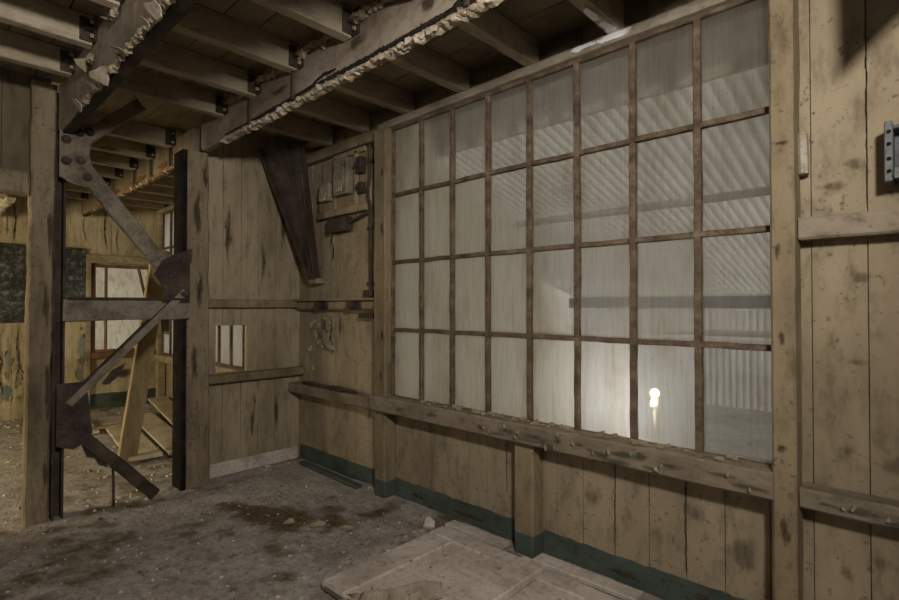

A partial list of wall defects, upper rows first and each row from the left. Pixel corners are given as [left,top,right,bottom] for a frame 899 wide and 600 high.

peeling [70,0,177,113]
crack [224,0,474,135]